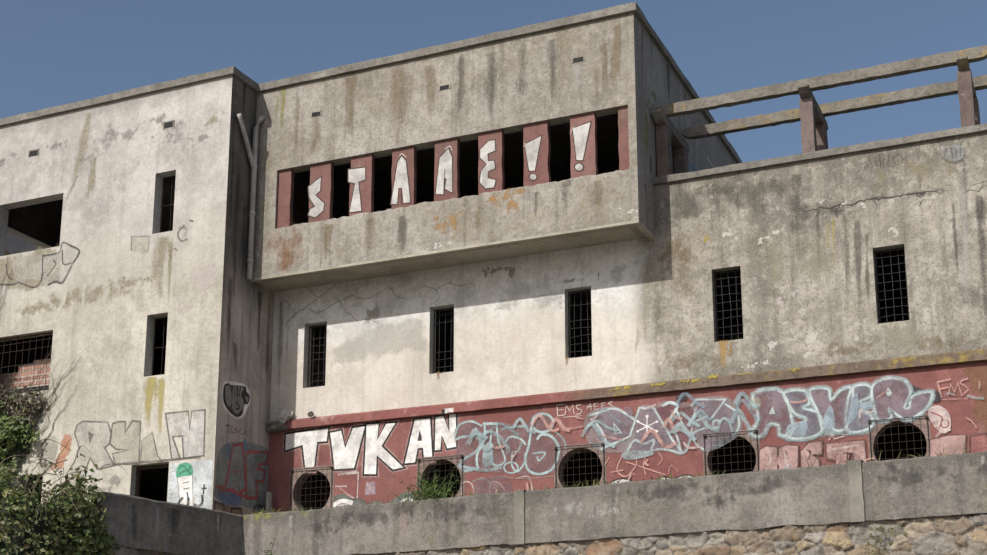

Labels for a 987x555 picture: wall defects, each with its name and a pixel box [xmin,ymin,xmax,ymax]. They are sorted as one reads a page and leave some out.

damp [487,58,496,102]
crack [790,180,987,220]
damp [846,223,869,289]
crack [285,278,475,325]